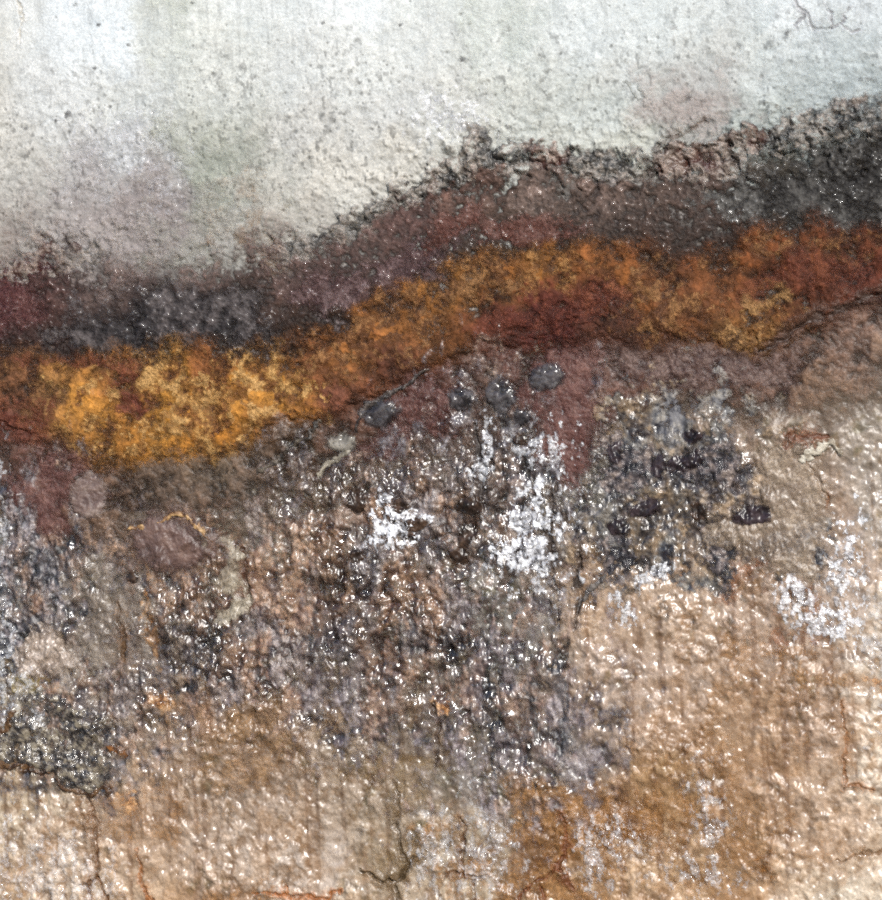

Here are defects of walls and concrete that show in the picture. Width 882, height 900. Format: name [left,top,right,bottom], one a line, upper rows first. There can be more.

crack [793,0,863,33]
rust [0,221,882,464]
leakage [0,116,882,829]
peeling [0,688,118,799]
crack [85,799,109,900]
crack [136,848,155,900]
crack [255,886,343,900]
crack [359,800,423,900]
crack [445,817,486,900]